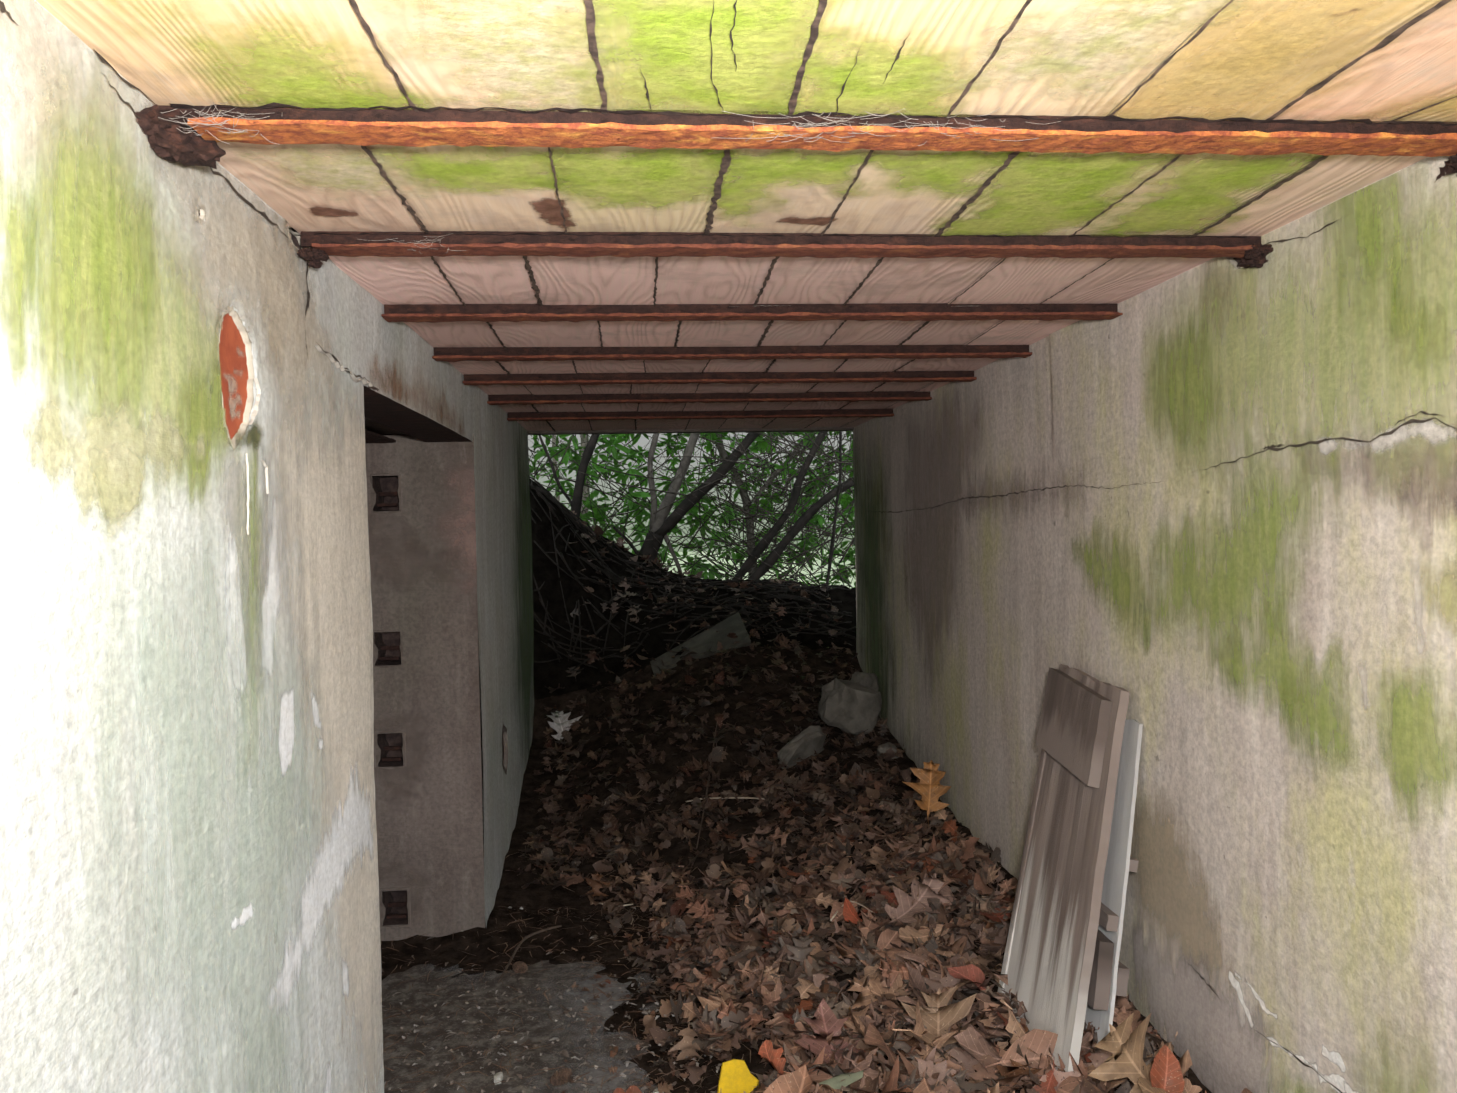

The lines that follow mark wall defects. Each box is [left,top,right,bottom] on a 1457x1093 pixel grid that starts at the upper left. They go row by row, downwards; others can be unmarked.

leakage [32,401,204,531]
crack [865,411,1457,513]
leakage [1361,433,1457,510]
leakage [1130,807,1272,1093]
crack [1255,1030,1343,1093]